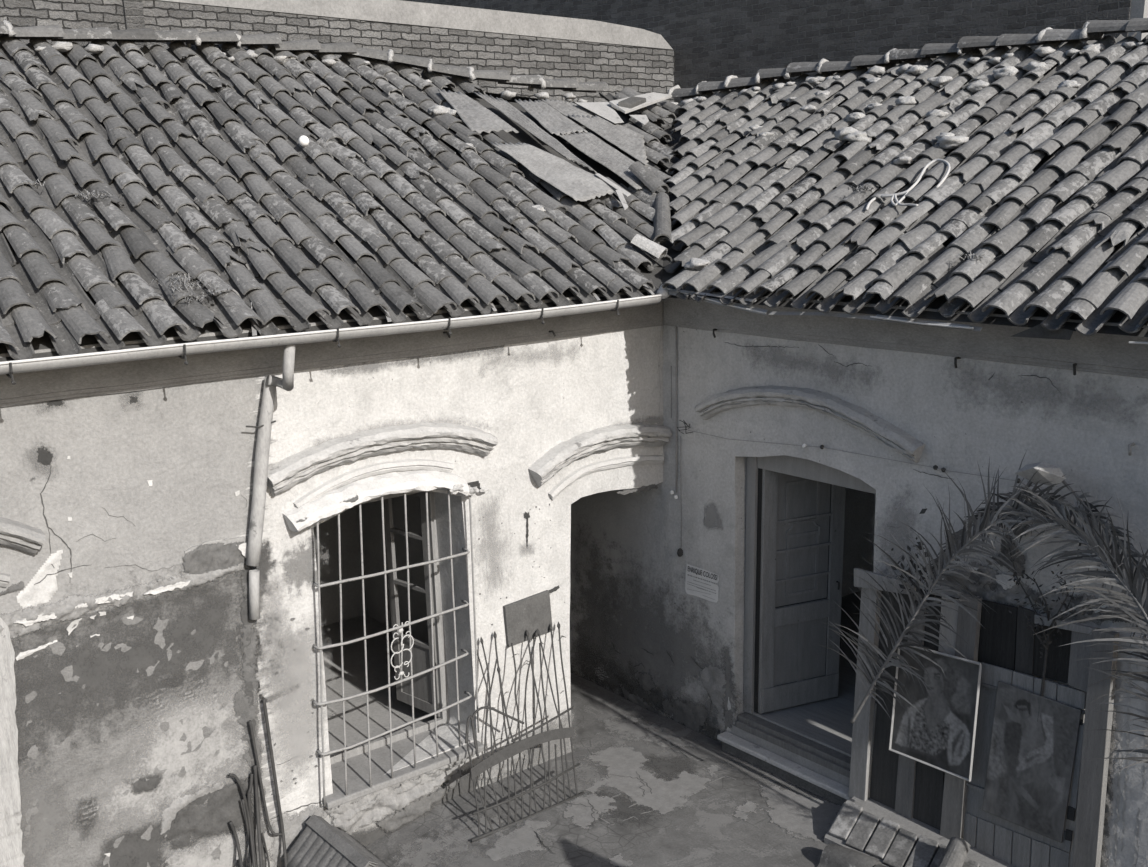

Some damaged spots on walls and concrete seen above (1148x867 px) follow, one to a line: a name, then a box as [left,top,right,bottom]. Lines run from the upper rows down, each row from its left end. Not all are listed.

crack [40,466,174,572]
spalling [0,536,262,867]
spalling [268,745,528,867]
leakage [570,530,742,743]